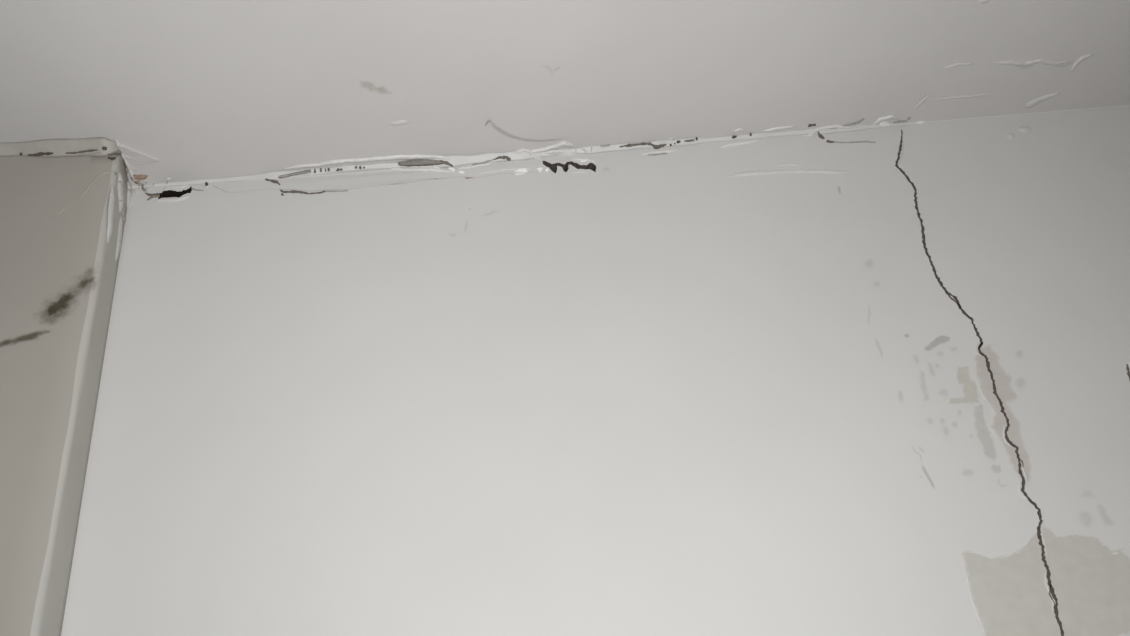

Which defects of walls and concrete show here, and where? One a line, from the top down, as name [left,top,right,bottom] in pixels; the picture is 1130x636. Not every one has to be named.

crack [485,116,570,161]
crack [600,137,698,156]
crack [265,166,365,196]
damp [48,295,70,315]
crack [805,117,1064,636]
peeling [961,525,1130,636]